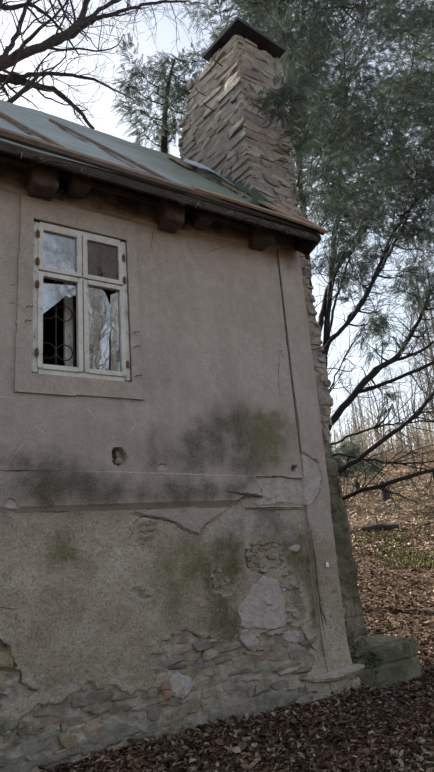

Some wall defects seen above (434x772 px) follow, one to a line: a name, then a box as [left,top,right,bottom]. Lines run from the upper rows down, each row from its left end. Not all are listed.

crack [277,263,317,476]
spalling [0,540,316,772]
crack [0,470,327,651]
peeling [244,453,322,509]